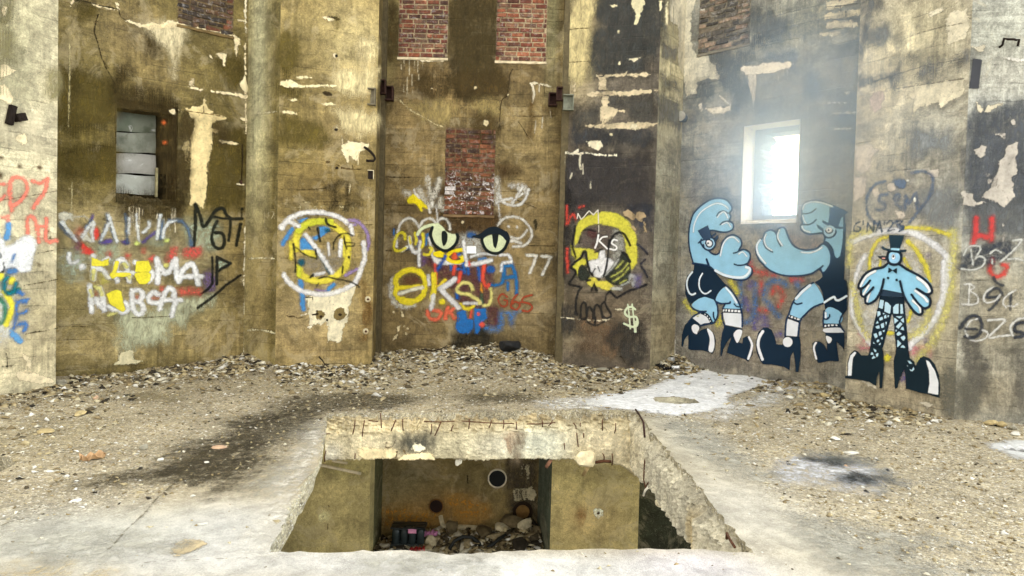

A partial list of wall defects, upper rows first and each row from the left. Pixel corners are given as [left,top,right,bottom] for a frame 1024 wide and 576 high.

peeling [126,20,241,66]
crack [70,0,128,144]
peeling [565,0,731,188]
peeling [741,61,794,104]
peeling [976,101,1003,113]
peeling [169,78,248,208]
peeling [960,120,1018,207]
peeling [300,286,356,343]
spalling [352,413,555,460]
peeling [512,464,537,502]